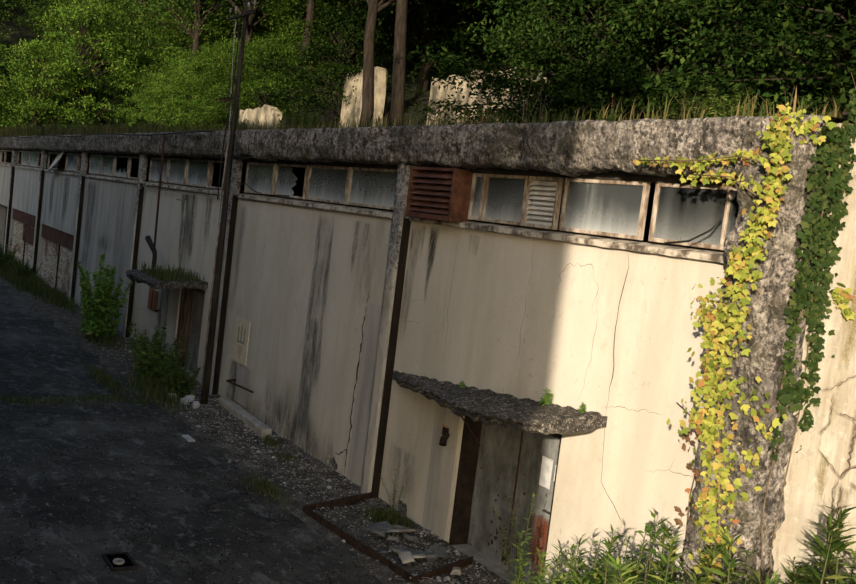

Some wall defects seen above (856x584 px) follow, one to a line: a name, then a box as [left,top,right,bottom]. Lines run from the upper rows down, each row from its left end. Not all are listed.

crack [336,292,369,474]
rust [530,515,549,570]
crack [557,256,663,527]
crack [818,375,856,575]